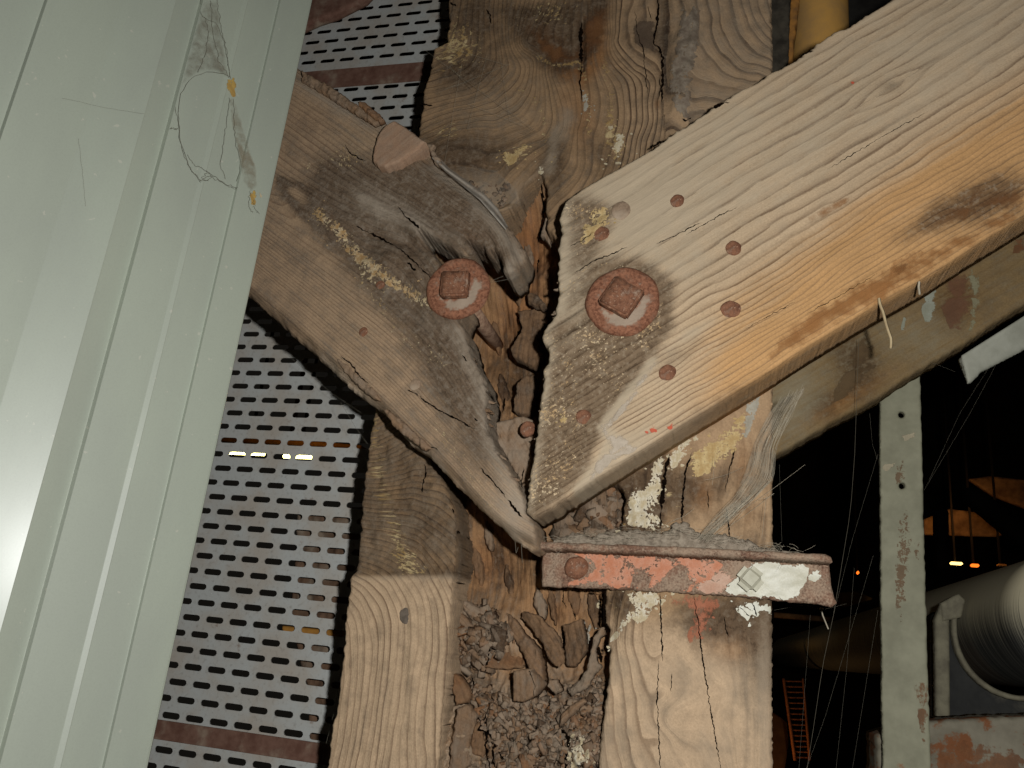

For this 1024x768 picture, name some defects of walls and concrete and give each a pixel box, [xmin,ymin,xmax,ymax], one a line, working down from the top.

spalling [473,145,560,495]
crack [536,184,546,274]
water stain [787,252,940,344]
crack [408,390,478,429]
crack [481,468,524,517]
spalling [541,397,760,542]
spalling [443,485,822,768]
crack [656,597,672,768]
crack [694,599,721,767]
rust [917,683,1024,768]